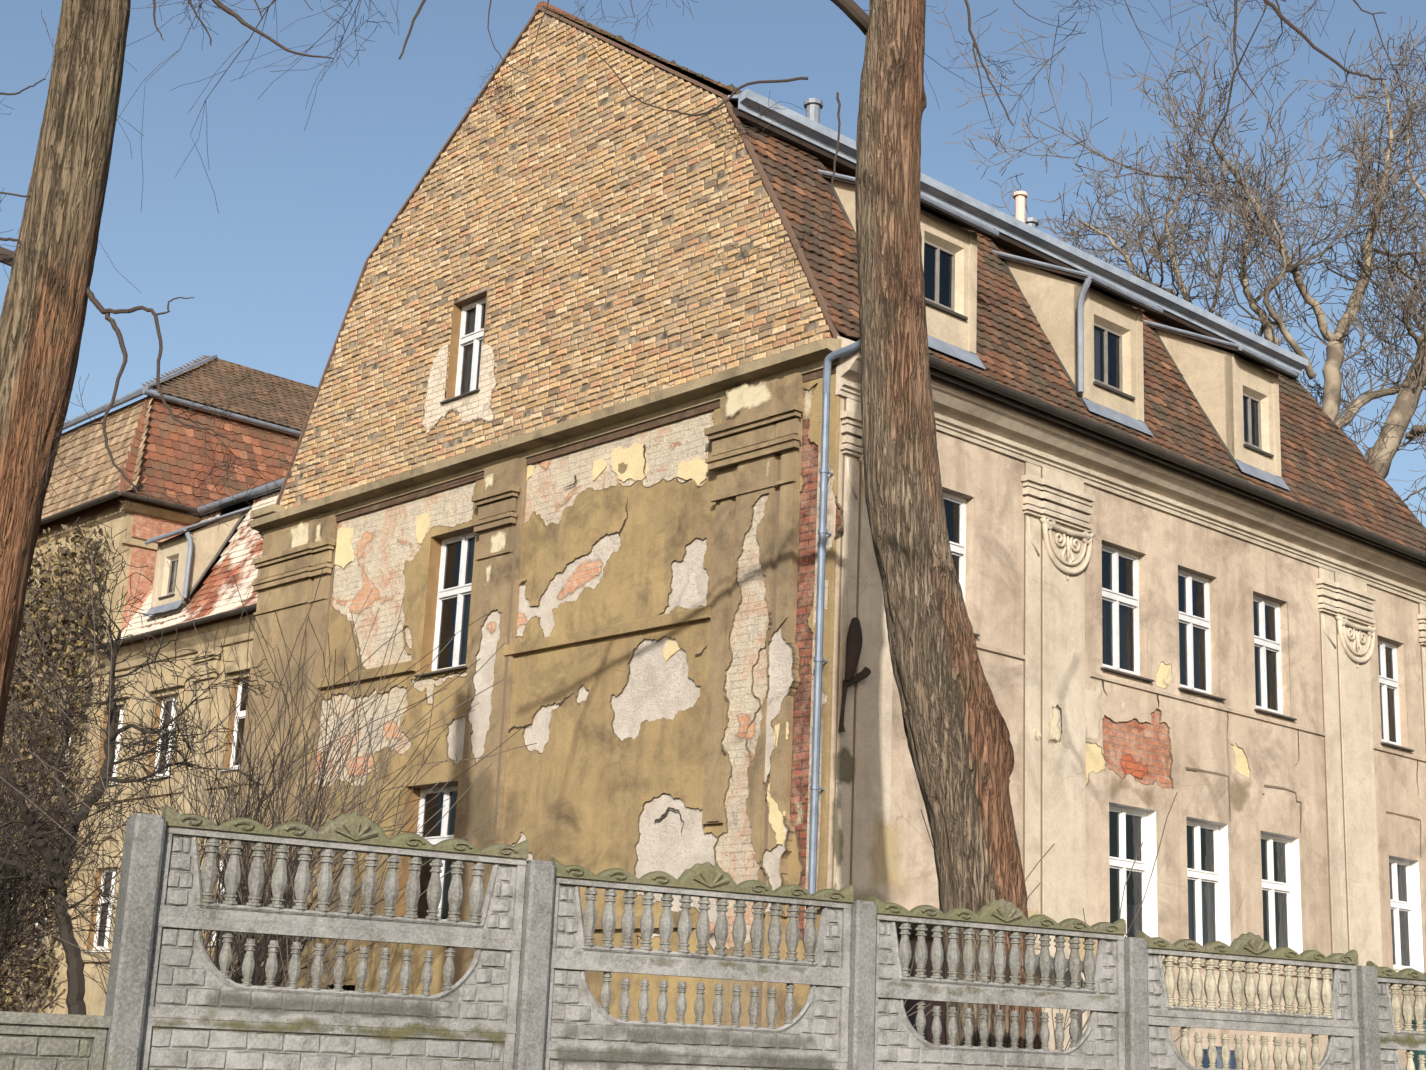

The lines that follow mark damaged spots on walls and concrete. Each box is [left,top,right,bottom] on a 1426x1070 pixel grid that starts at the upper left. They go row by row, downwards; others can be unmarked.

flaking render [122,513,190,632]
spalling [291,383,770,787]
spalling [633,383,844,950]
flaking render [1156,661,1173,689]
spalling [1085,686,1174,788]